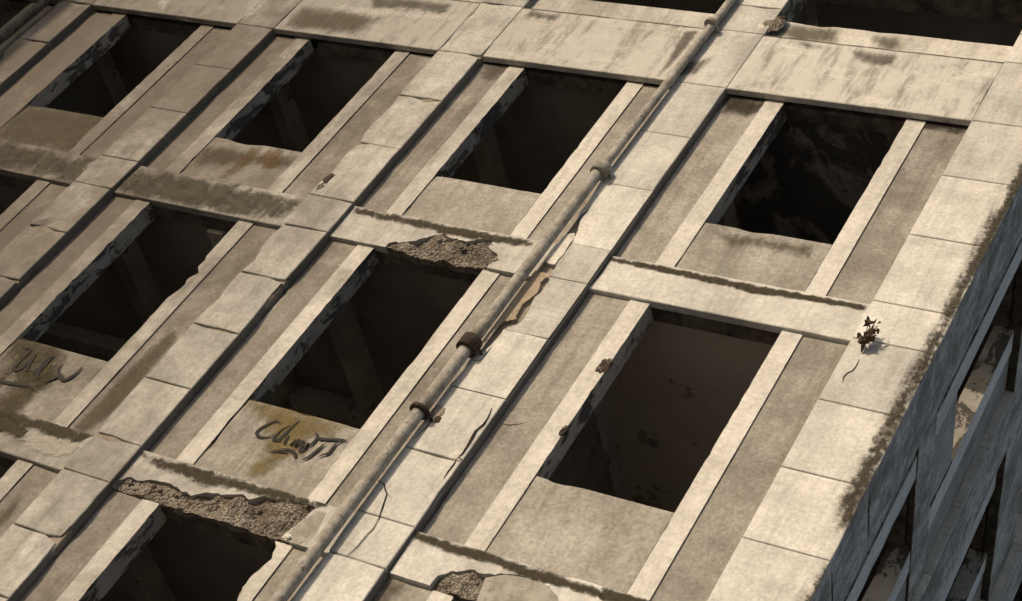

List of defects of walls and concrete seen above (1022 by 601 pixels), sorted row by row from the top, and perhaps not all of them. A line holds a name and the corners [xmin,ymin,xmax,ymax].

damp [857,38,897,64]
damp [201,149,292,165]
spalling [384,234,498,275]
damp [838,164,1022,527]
crack [443,408,526,479]
spalling [113,479,326,545]
spalling [432,571,558,601]